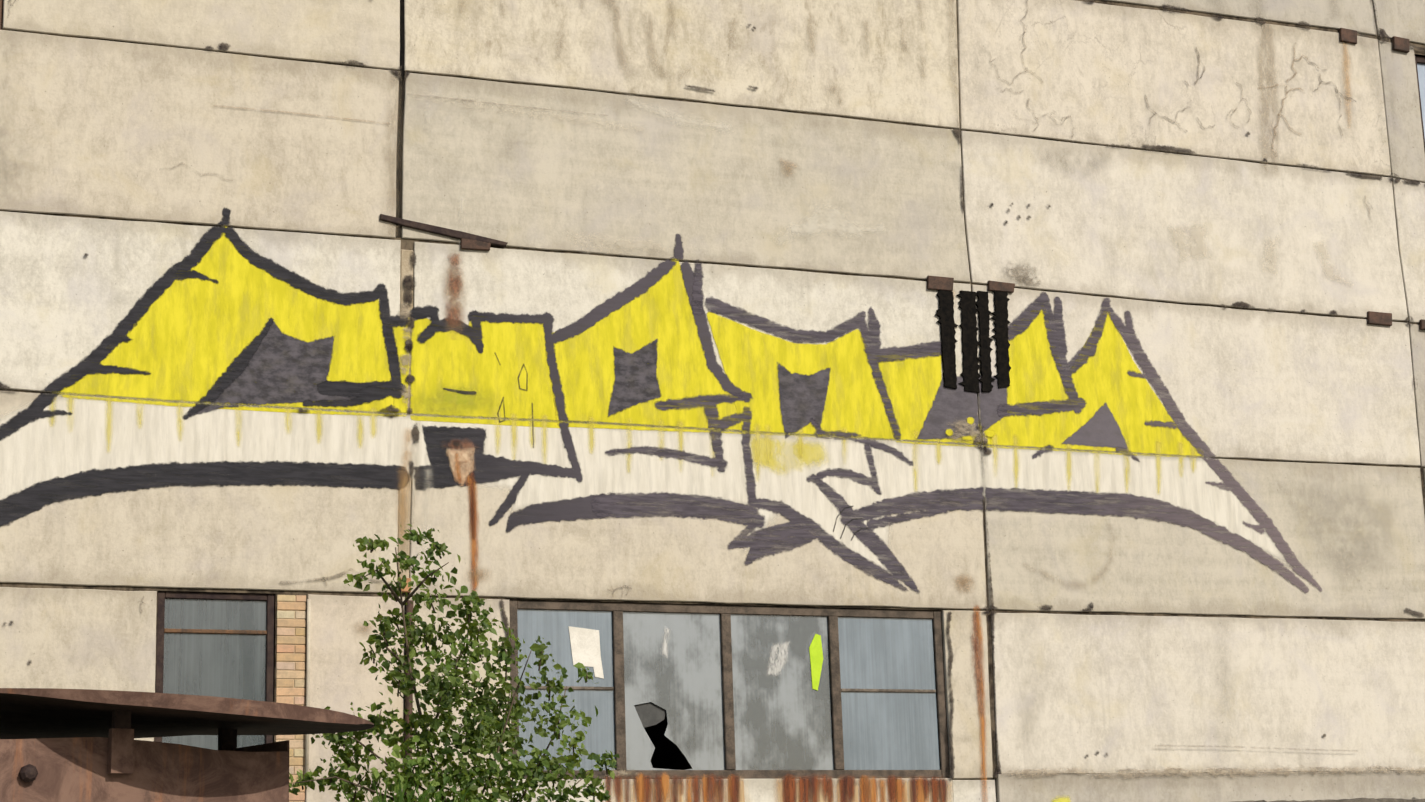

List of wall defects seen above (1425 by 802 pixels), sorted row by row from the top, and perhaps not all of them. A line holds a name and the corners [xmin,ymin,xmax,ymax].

corrosion [447,255,461,325]
corrosion [466,472,481,591]
corrosion [972,607,986,787]
corrosion [606,774,745,802]
corrosion [778,775,949,802]